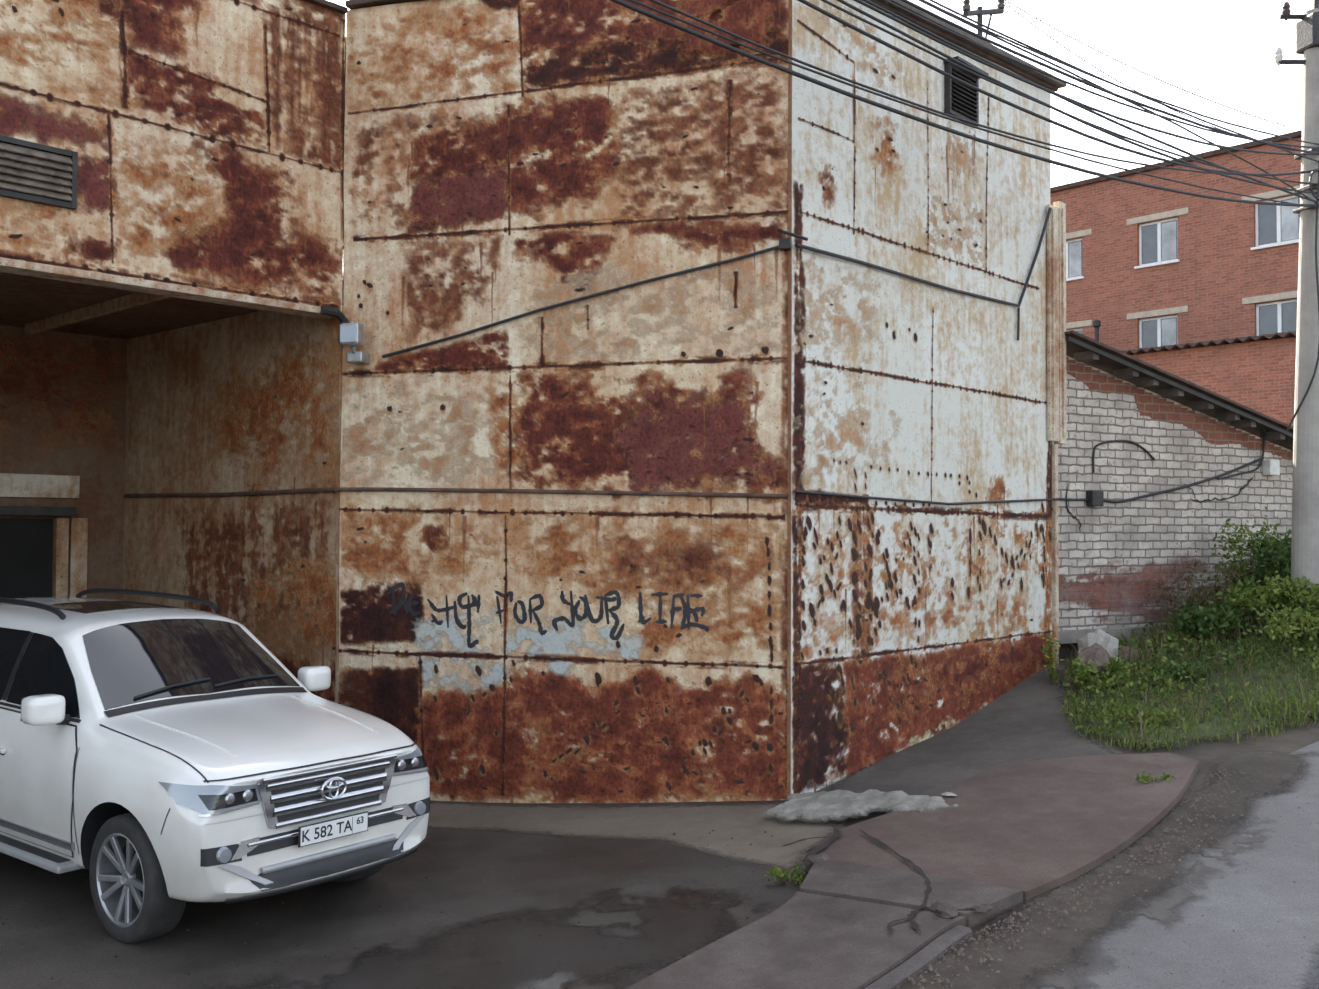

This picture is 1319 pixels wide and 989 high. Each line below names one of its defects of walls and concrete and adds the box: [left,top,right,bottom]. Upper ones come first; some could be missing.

rust [0,0,1053,803]
peeling [1066,357,1293,459]
peeling [1059,560,1250,621]
crack [782,828,989,935]